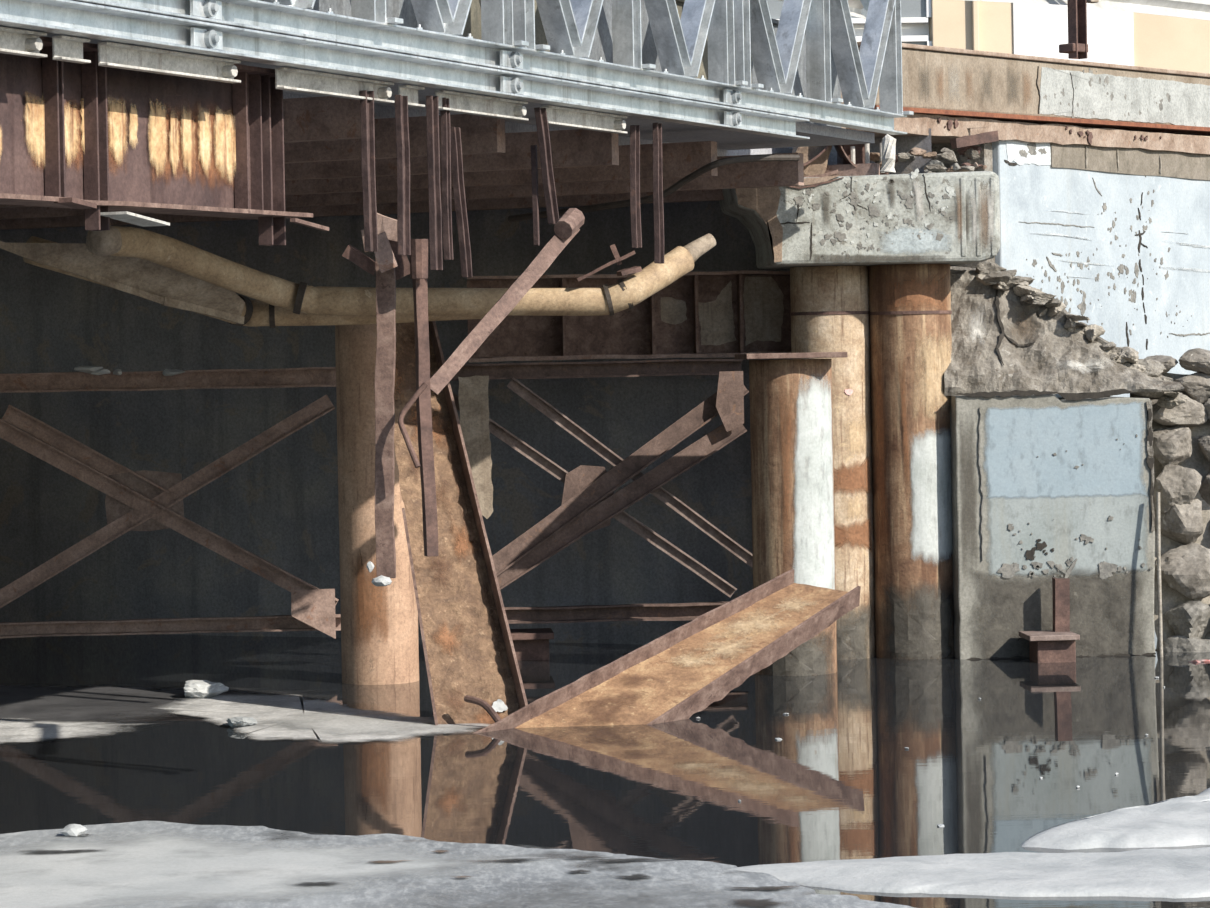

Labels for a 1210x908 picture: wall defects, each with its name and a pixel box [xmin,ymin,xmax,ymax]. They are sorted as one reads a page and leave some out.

corrosion [155,108,226,183]
peeling [1019,143,1047,158]
crack [781,204,812,260]
peeling [1026,175,1171,335]
crack [1126,192,1210,350]
corrosion [409,409,445,442]
spalling [1057,389,1134,400]
spalling [1075,400,1155,580]
corrosion [455,528,469,555]
peeling [997,523,1073,578]
corrosion [674,598,810,666]
water stain [975,571,1142,659]